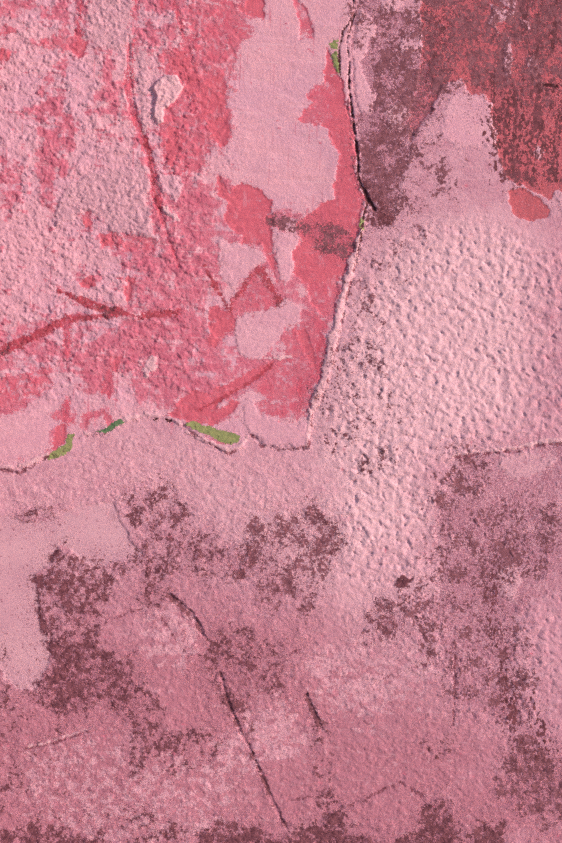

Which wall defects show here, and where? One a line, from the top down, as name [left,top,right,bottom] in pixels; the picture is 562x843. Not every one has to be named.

crack [0,456,49,477]
flaking render [0,0,366,693]
damp [0,425,562,843]
damp [259,0,562,498]
peeling [405,0,562,222]
crack [540,82,562,90]